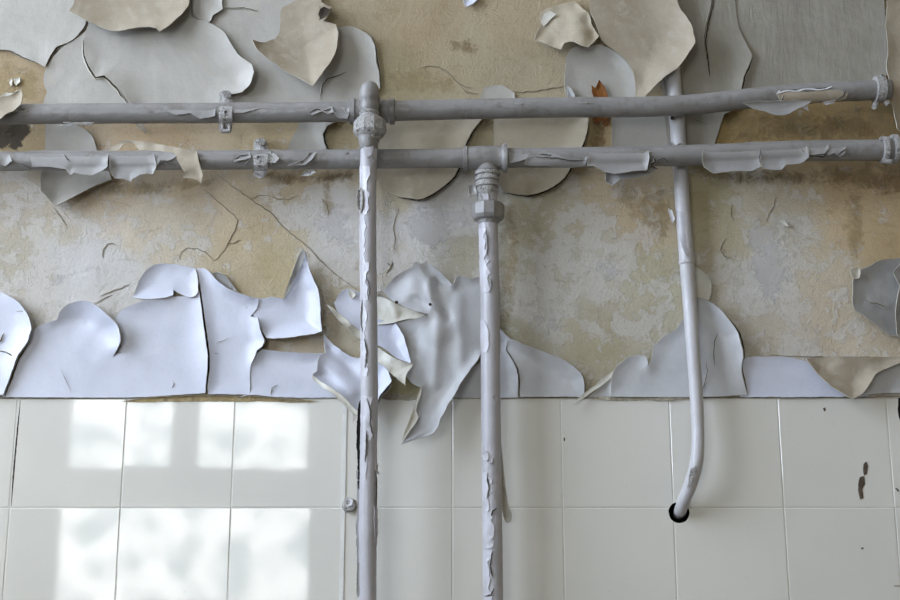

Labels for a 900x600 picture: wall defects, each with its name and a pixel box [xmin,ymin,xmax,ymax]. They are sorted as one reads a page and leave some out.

peeling [0,0,382,176]
peeling [480,85,515,99]
peeling [494,111,846,197]
peeling [534,0,900,131]
crack [179,154,399,366]
peeling [0,119,491,598]
peeling [492,318,690,405]
peeling [695,258,900,419]
spalling [858,462,868,499]